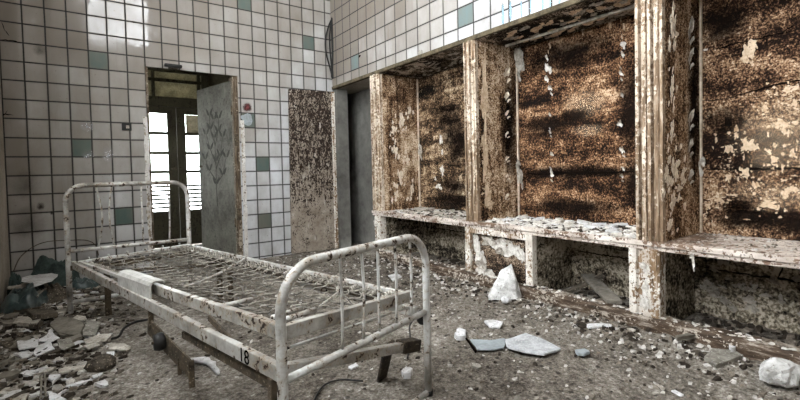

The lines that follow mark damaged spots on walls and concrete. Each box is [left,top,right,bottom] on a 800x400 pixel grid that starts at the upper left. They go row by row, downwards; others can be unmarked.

peeling [389,107,422,204]
water stain [529,110,586,136]
peeling [503,0,635,119]
water stain [533,36,608,70]
water stain [537,199,616,214]
water stain [529,161,636,199]
water stain [620,59,635,148]
peeling [661,66,705,235]
peeling [668,1,708,70]
flaking render [740,39,758,66]
crack [703,80,800,101]
peeling [703,81,800,222]